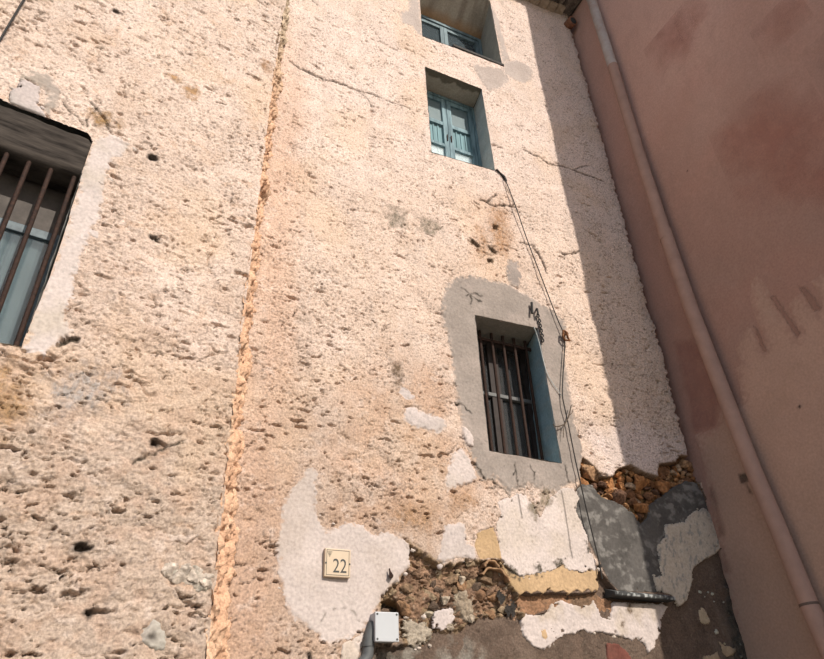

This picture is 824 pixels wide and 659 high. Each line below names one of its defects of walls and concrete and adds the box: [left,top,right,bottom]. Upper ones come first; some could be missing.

flaking render [443,426,477,493]
flaking render [274,458,747,659]